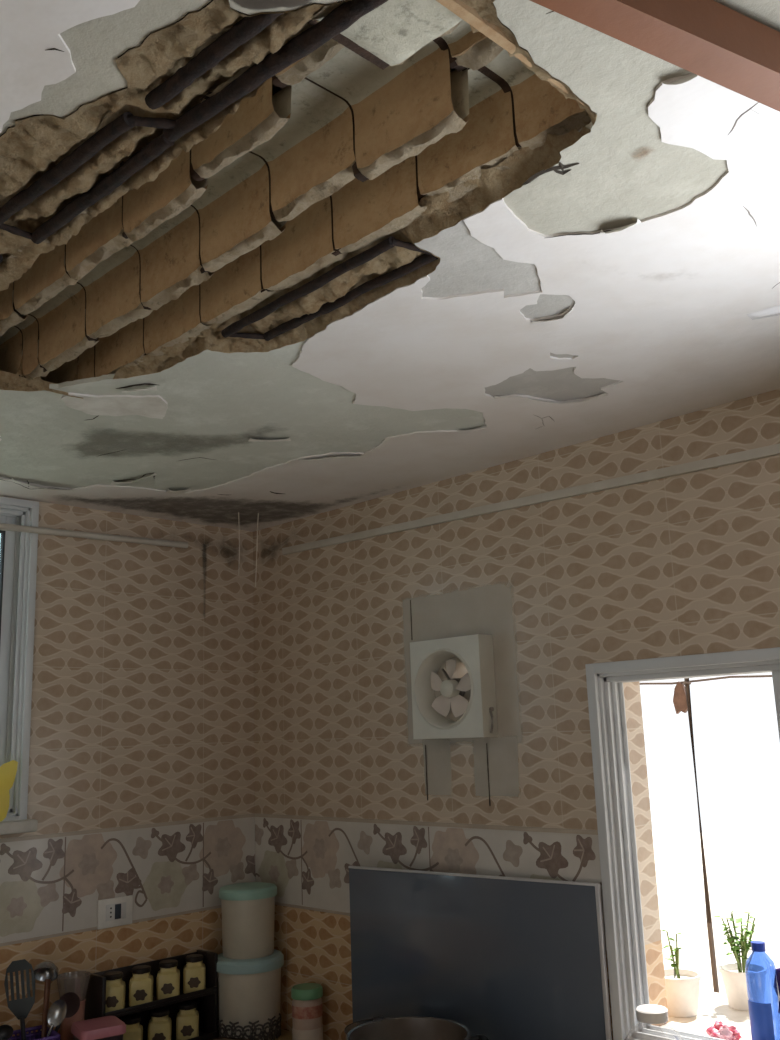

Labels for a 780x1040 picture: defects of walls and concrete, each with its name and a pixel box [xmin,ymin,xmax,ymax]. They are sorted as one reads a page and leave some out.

flaking render [713,0,780,32]
flaking render [0,0,728,494]
damp [77,498,321,524]